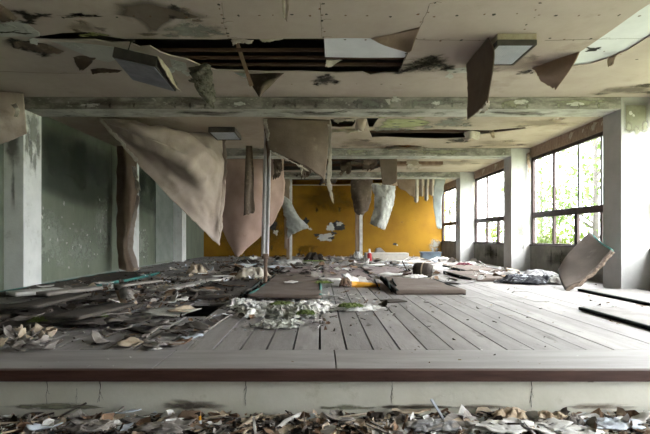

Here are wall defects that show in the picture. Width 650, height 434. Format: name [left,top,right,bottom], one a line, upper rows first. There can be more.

peeling [52,41,115,62]
damp [395,55,455,74]
damp [314,74,338,86]
damp [612,84,650,93]
damp [356,99,470,131]
damp [495,99,545,115]
damp [7,139,17,157]
peeling [303,217,346,241]